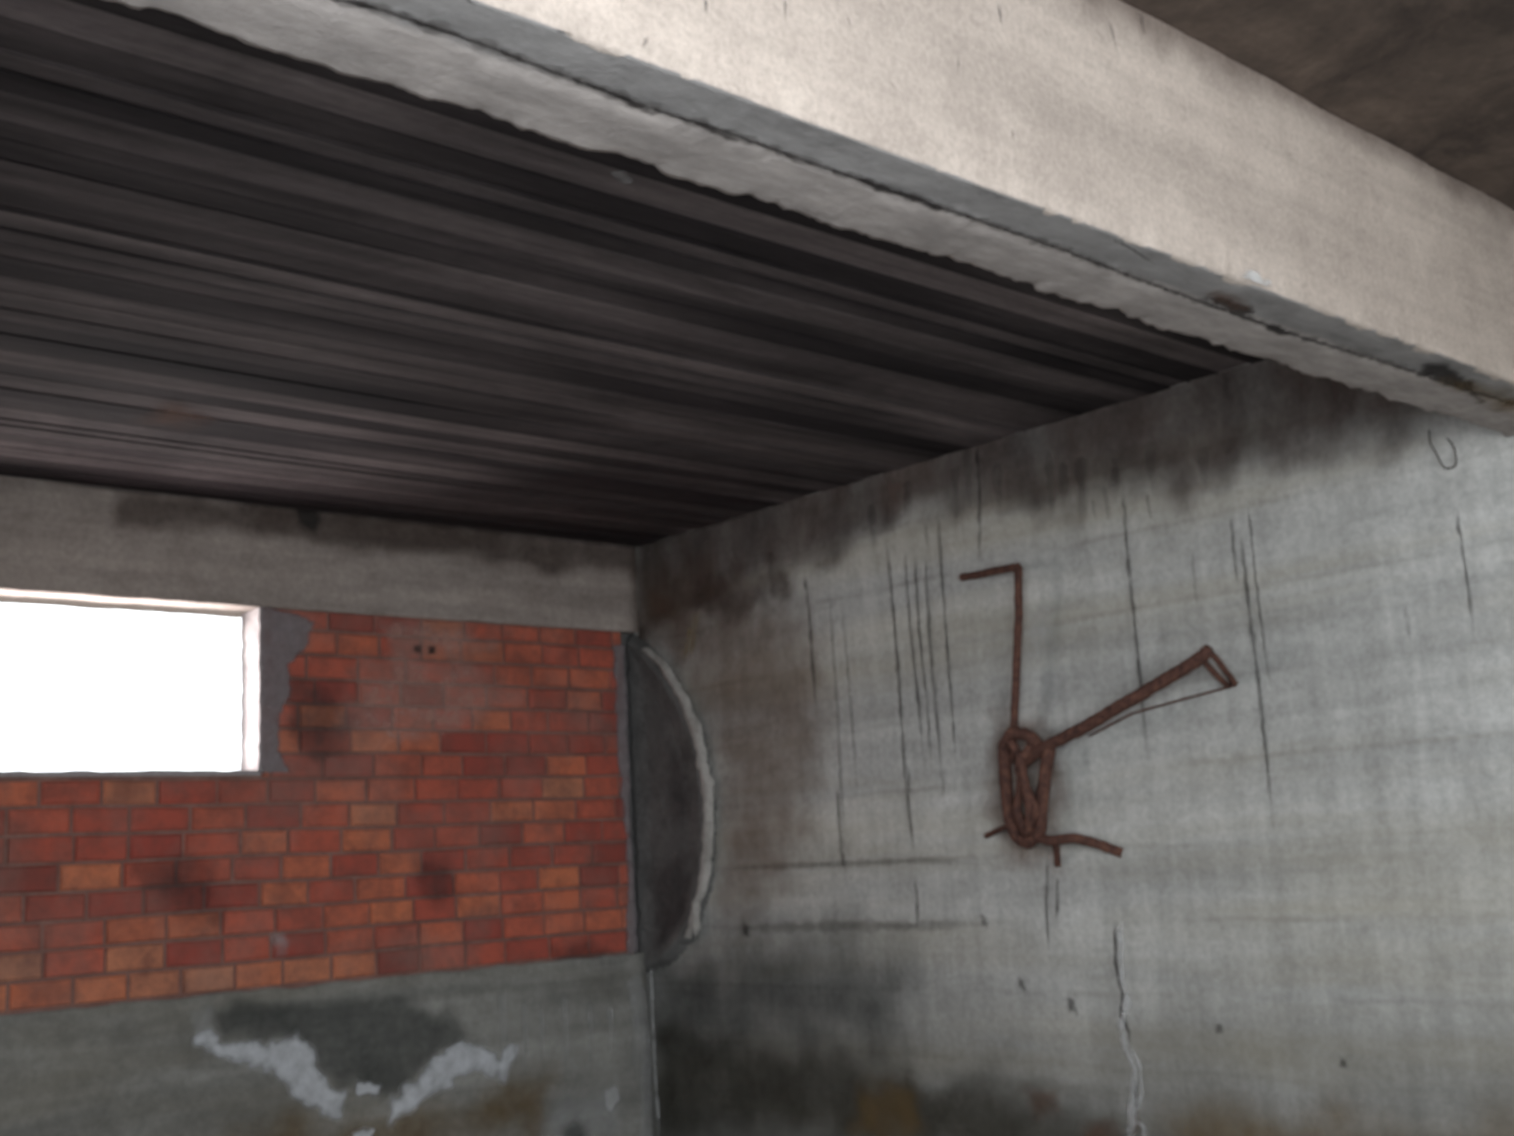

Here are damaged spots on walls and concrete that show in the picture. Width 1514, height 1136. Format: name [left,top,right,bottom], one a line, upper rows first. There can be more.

damp [638,358,1418,640]
rust [959,563,1238,867]
damp [227,1007,454,1087]
damp [652,1010,1031,1136]
crack [1114,932,1142,1126]